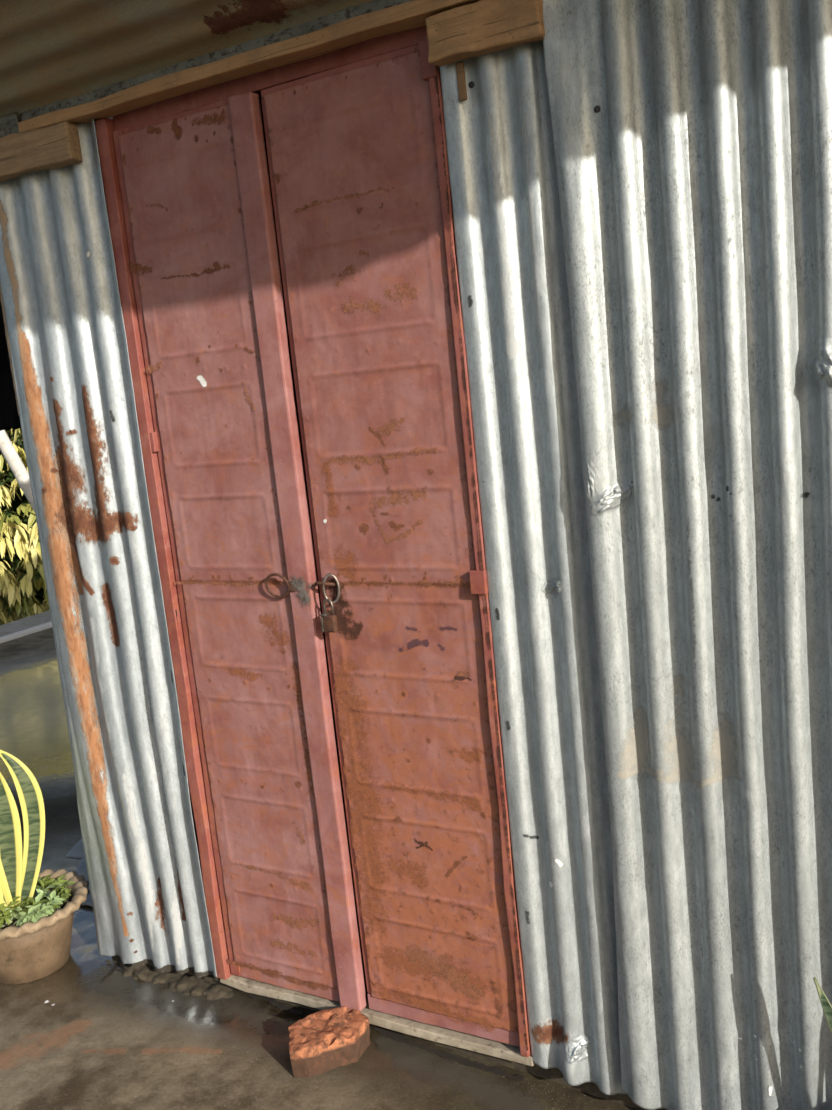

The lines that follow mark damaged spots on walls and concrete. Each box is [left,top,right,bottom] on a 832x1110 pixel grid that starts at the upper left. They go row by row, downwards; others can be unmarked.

rust [204,0,289,35]
rust [434,66,484,571]
rust [0,200,138,953]
rust [327,548,363,640]
rust [383,782,482,811]
rust [484,594,568,1050]
rust [155,878,171,946]
rust [177,870,186,921]
rust [375,946,503,1032]